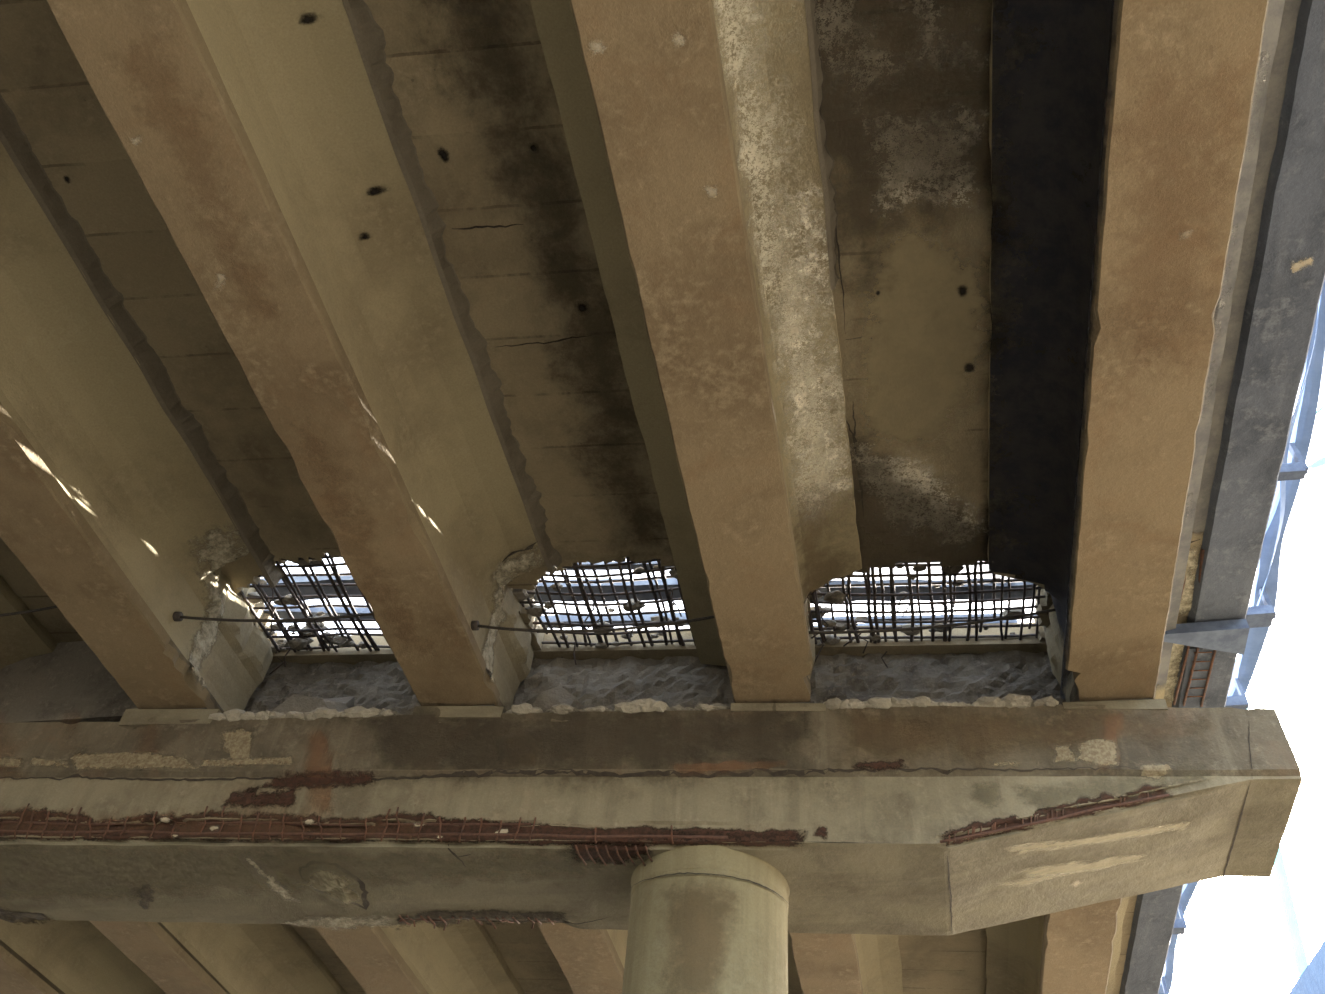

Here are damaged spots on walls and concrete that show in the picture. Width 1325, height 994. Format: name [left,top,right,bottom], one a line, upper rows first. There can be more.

leakage [456,0,661,542]
leakage [714,0,1114,698]
spalling [189,527,390,687]
spalling [482,548,695,681]
spalling [807,575,1045,668]
peeling [246,858,299,901]
rust [222,769,376,808]
spalling [0,803,806,866]